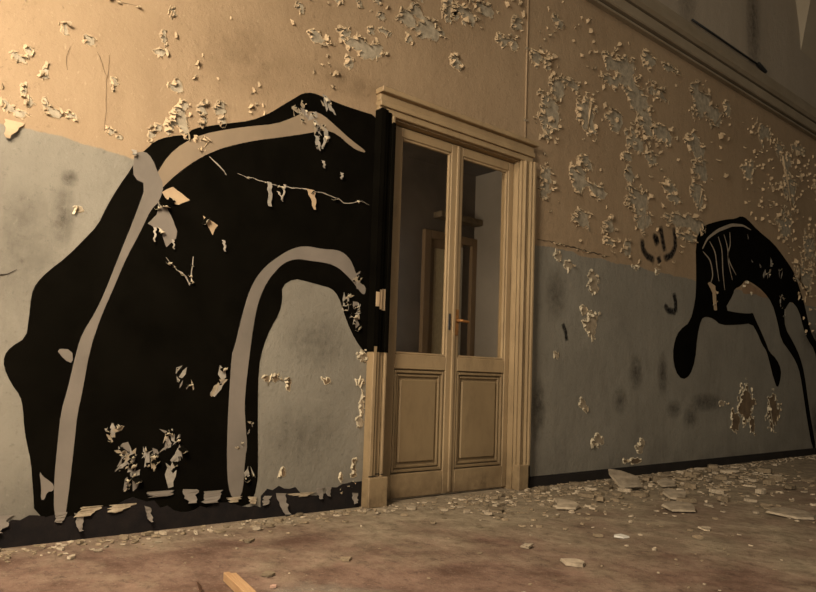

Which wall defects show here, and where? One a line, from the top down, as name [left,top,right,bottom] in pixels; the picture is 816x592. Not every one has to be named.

peeling [0,82,78,138]
peeling [147,77,227,151]
peeling [292,94,336,168]
peeling [306,0,731,273]
peeling [148,187,189,249]
peeling [202,216,218,235]
peeling [264,182,286,207]
peeling [740,116,816,333]
peeling [342,272,362,331]
peeling [176,365,194,390]
peeling [210,366,228,397]
flaking render [0,423,362,559]